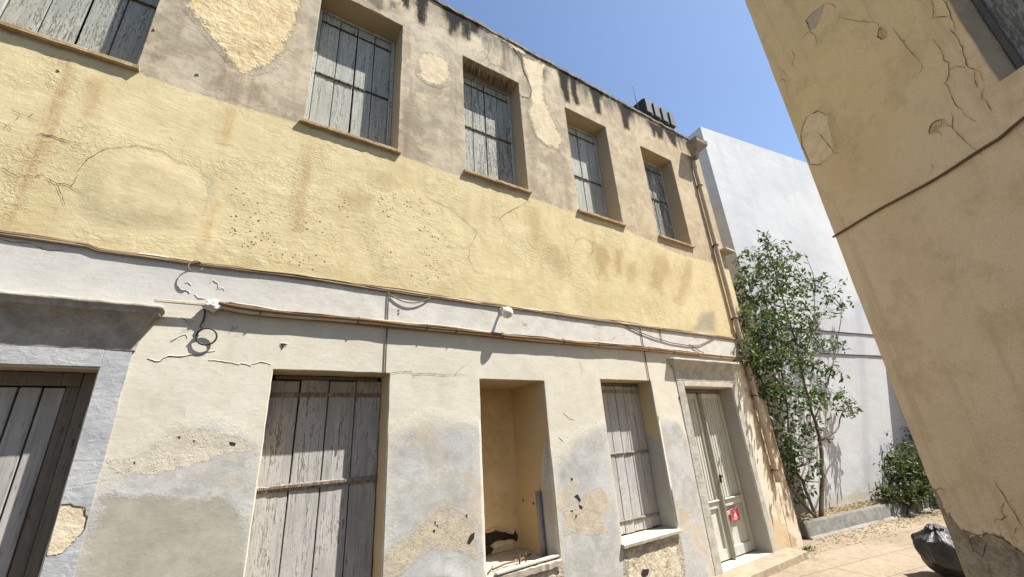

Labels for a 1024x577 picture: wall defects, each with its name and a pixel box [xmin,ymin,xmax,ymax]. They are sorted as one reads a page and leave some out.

flaking render [178,0,308,76]
damp [363,0,481,43]
flaking render [415,49,513,92]
damp [558,69,604,116]
damp [616,101,633,131]
flaking render [799,107,837,168]
crack [844,0,992,155]
crack [2,168,85,204]
flaking render [46,412,264,565]
flaking render [383,407,518,577]
flaking render [525,412,715,577]
crack [994,483,1022,530]